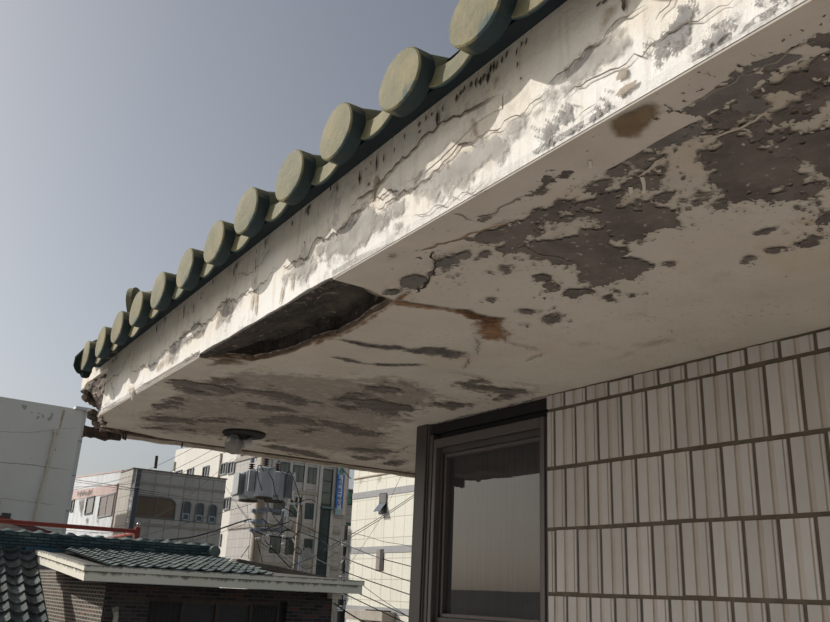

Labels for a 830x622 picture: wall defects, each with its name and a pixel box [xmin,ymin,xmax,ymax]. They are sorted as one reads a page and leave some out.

damp [412,28,630,201]
damp [612,106,657,137]
crack [710,112,767,140]
peeling [433,33,830,304]
crack [101,0,732,409]
damp [280,194,403,302]
spalling [199,273,427,361]
damp [341,340,465,360]
rust [315,292,511,344]
peeling [517,310,566,325]
peeling [80,374,416,441]
peeling [450,379,534,401]